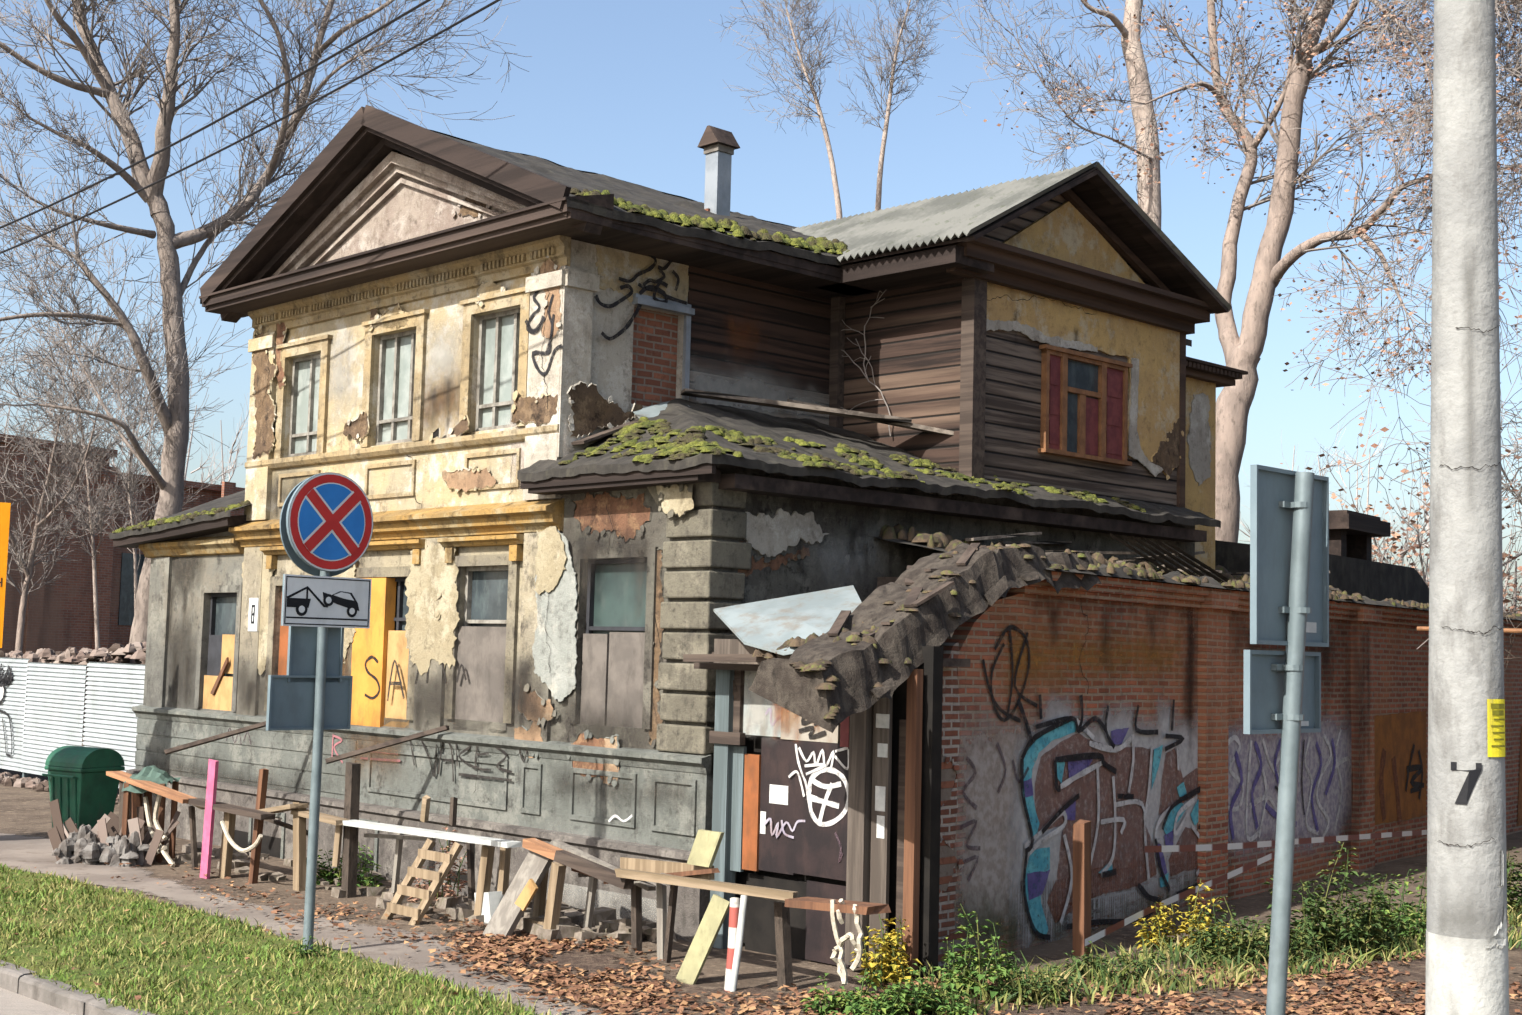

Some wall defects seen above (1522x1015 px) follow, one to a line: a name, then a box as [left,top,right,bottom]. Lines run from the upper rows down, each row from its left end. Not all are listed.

peeling [252,322,287,460]
peeling [442,463,496,493]
peeling [511,381,643,439]
peeling [986,319,1098,352]
peeling [1128,358,1211,486]
peeling [737,508,829,577]
peeling [405,539,460,676]
peeling [514,484,694,759]